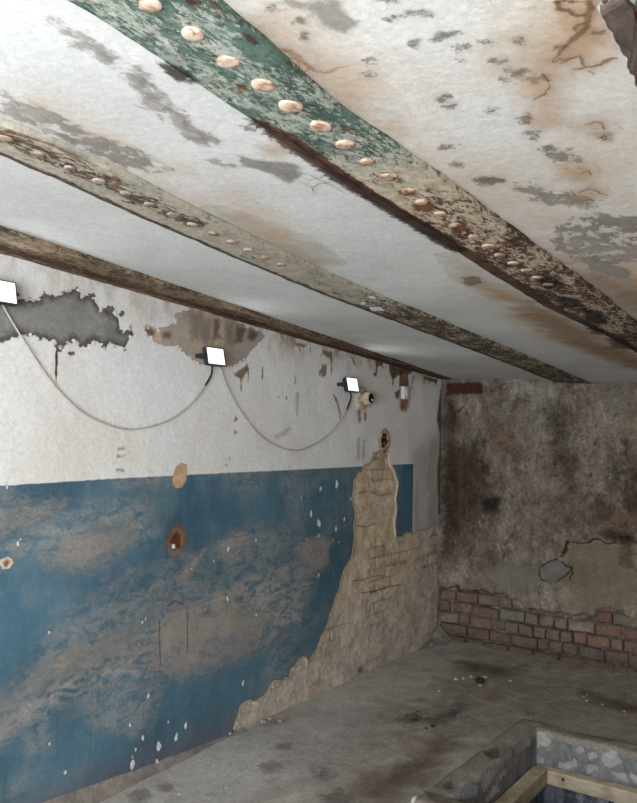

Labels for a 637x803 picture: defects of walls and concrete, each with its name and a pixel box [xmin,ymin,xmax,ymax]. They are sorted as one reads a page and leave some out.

leakage [382,10,433,23]
leakage [432,31,490,63]
leakage [487,58,543,84]
peeling [472,177,637,278]
peeling [0,287,133,377]
peeling [145,310,265,369]
leakage [530,277,637,366]
spalling [172,463,187,488]
spalling [0,557,13,570]
corrosion [169,529,185,552]
spalling [229,434,637,735]
crack [527,538,637,610]